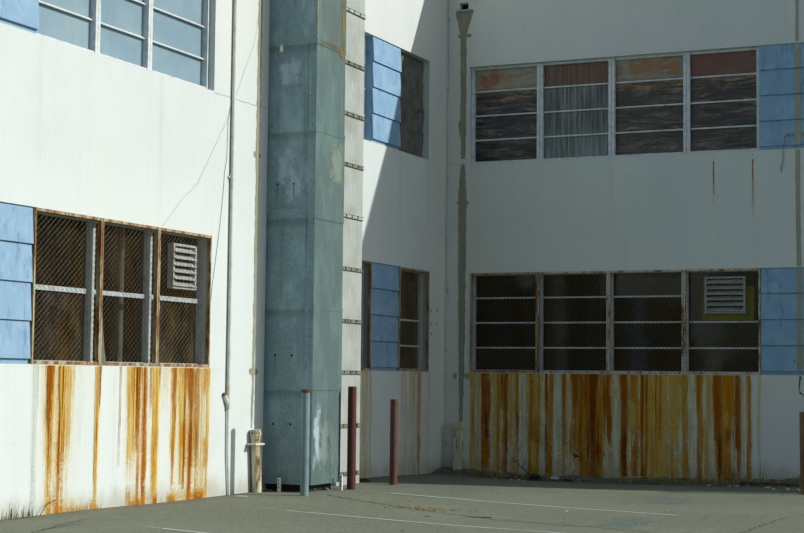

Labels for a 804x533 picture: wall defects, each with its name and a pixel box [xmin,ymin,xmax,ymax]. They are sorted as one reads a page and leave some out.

corrosion [44,365,102,514]
corrosion [119,366,161,506]
corrosion [167,367,211,502]
corrosion [470,373,760,480]